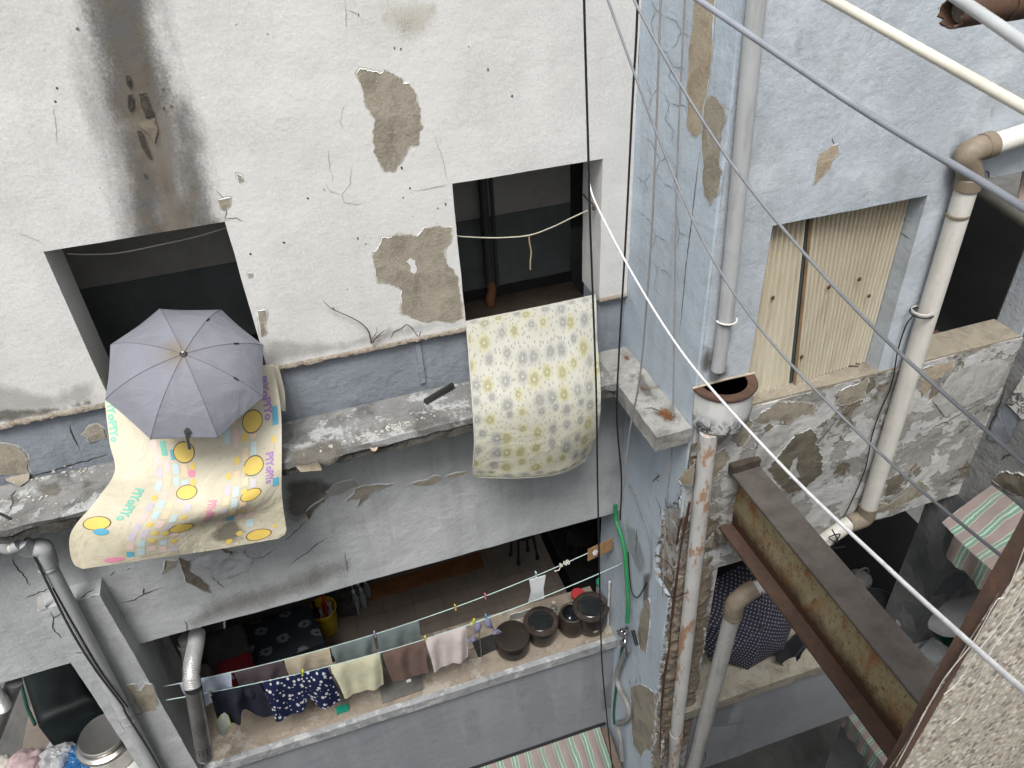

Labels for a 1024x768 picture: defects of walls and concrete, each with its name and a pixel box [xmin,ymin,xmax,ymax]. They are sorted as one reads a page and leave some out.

leakage [92,0,215,236]
peeling [354,66,424,172]
crack [637,0,701,330]
peeling [686,0,726,206]
peeling [812,142,840,185]
peeling [357,225,464,323]
peeling [713,400,824,495]
peeling [877,473,930,513]
peeling [992,470,1024,498]
crack [13,561,82,653]
peeling [160,556,211,593]
spalling [630,459,719,768]